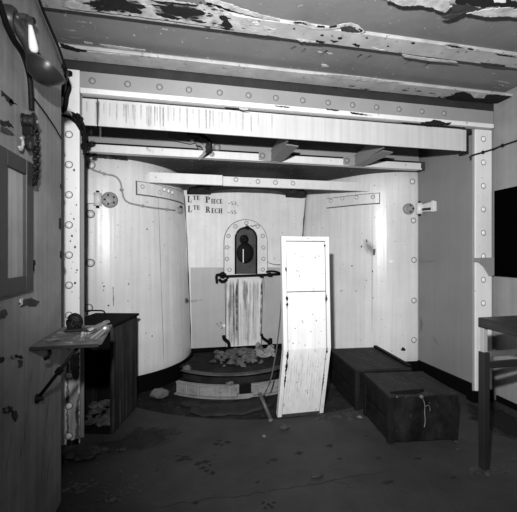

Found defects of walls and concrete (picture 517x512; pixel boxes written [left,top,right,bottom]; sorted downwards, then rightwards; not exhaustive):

peeling [62,0,280,33]
peeling [387,0,517,19]
peeling [293,21,368,43]
peeling [440,43,480,52]
peeling [402,54,458,63]
peeling [314,74,409,91]
spalling [430,92,511,103]
peeling [0,119,14,136]
peeling [19,298,39,307]